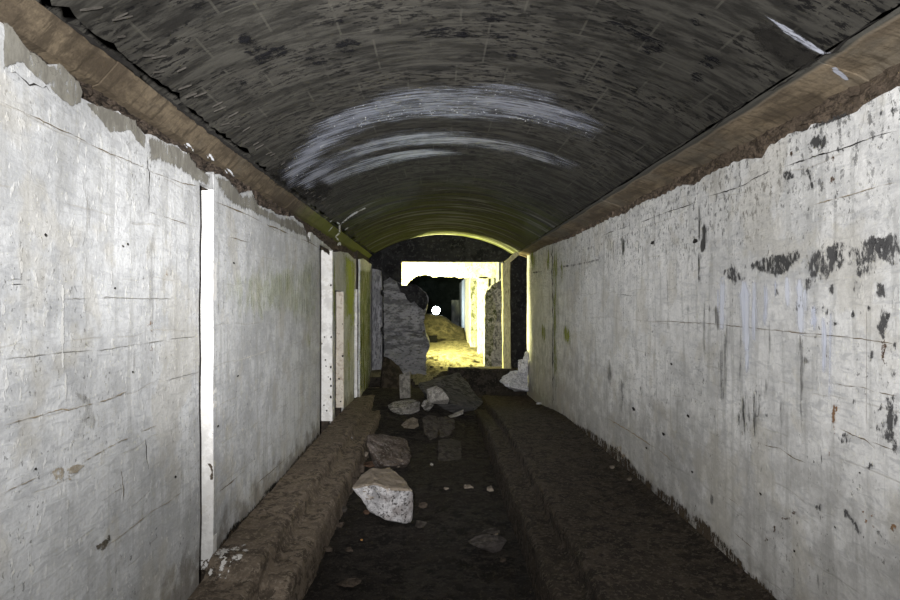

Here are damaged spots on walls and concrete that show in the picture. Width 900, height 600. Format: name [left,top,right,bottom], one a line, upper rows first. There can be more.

flaking render [3,23,355,258]
crack [526,13,894,400]
flaking render [552,63,900,244]
damp [704,234,900,396]
crack [10,391,127,424]
damp [870,396,898,454]